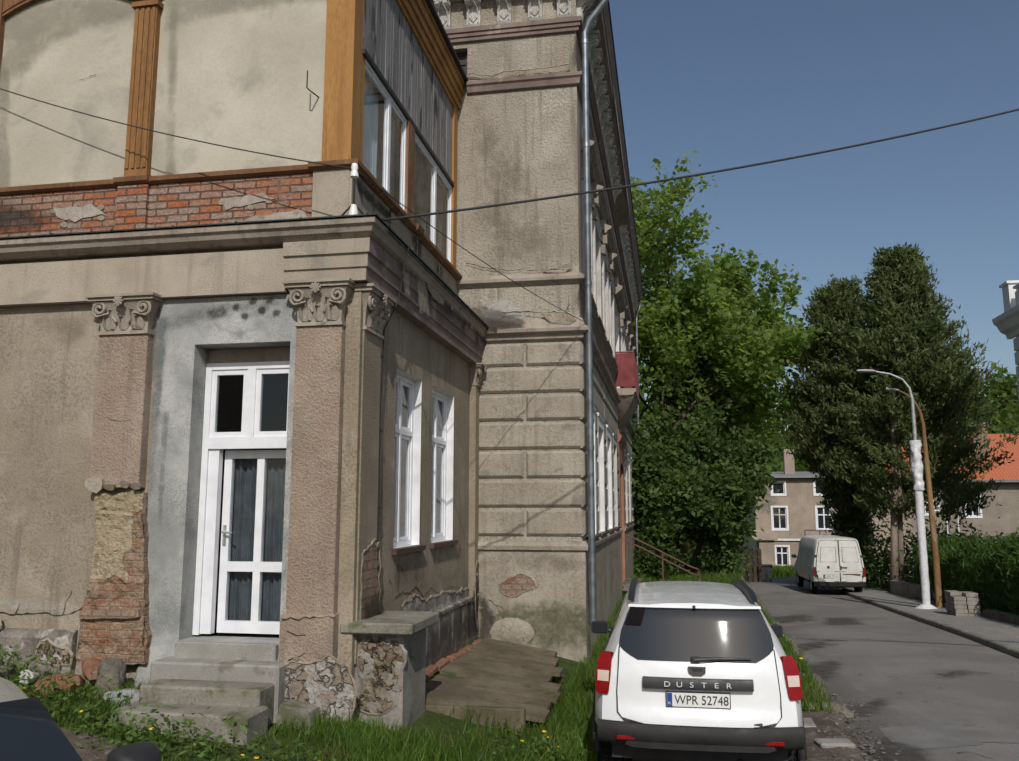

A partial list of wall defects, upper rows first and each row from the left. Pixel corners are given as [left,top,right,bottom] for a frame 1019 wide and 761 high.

flaking render [35,478,152,669]
flaking render [359,538,381,620]
crack [389,568,461,599]
flaking render [498,571,538,598]
flaking render [336,634,408,716]